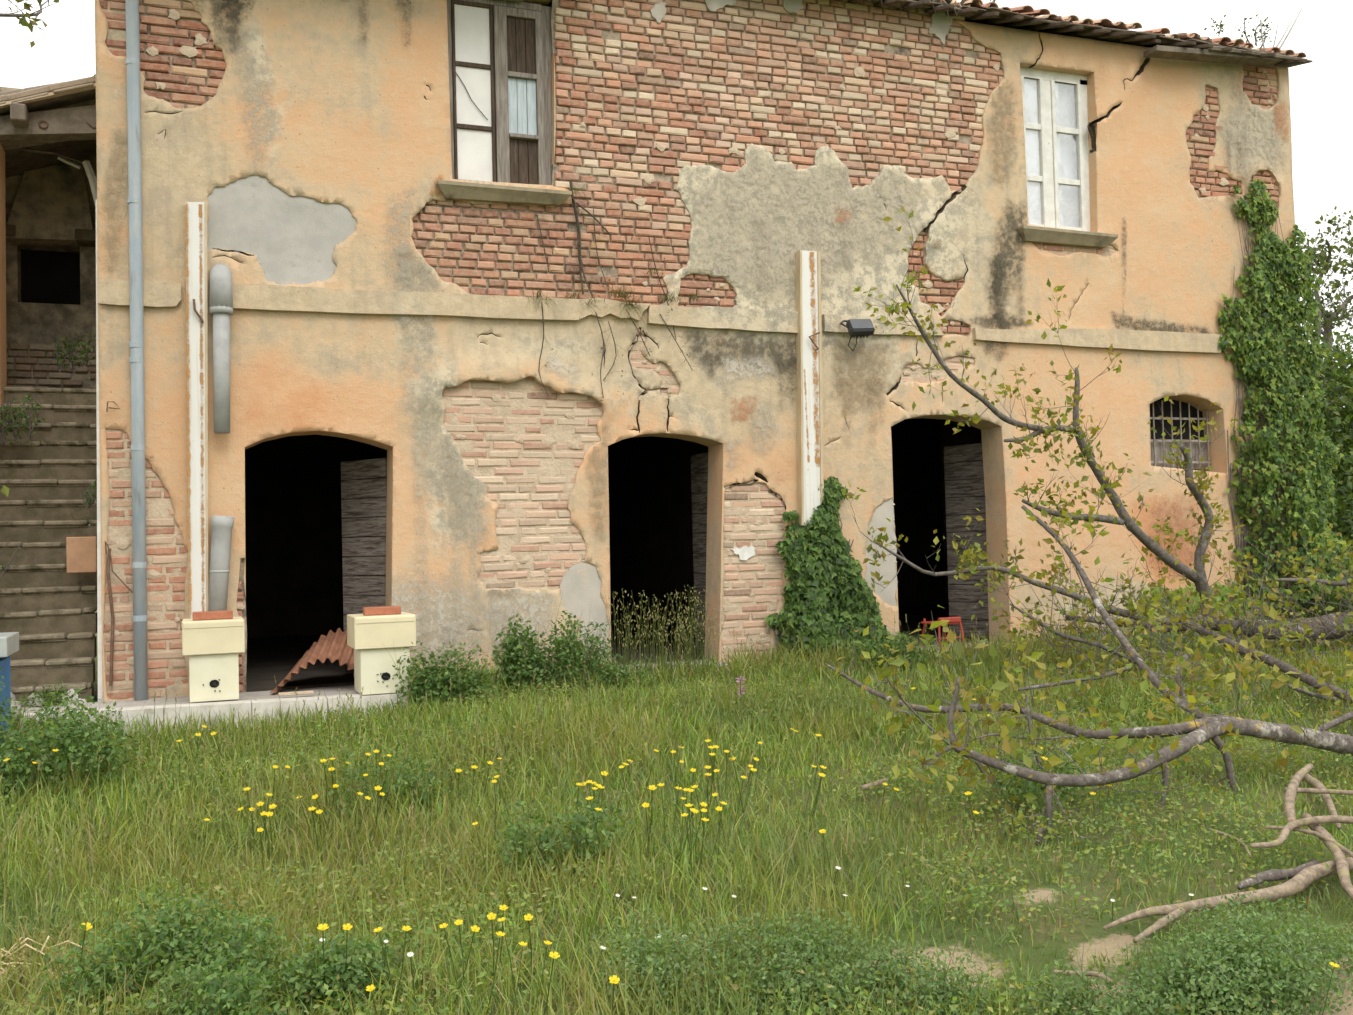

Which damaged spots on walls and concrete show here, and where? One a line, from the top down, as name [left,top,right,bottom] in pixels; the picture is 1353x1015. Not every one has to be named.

peeling [99,0,226,109]
water stain [214,0,268,156]
peeling [411,0,1003,308]
crack [1086,44,1159,152]
peeling [1186,86,1279,212]
peeling [1239,65,1278,109]
peeling [207,174,357,285]
peeling [907,229,970,336]
peeling [897,356,974,383]
peeling [442,377,610,657]
peeling [721,480,786,661]